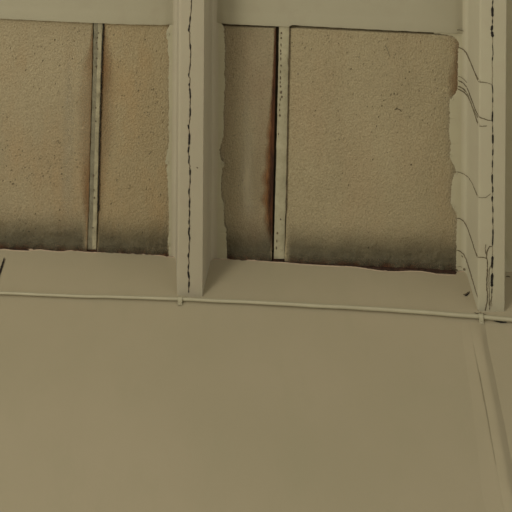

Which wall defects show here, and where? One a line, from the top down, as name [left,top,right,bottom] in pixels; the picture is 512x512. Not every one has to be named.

water stain [0,231,83,251]
peeling [0,25,185,297]
water stain [98,235,167,255]
crack [185,0,193,293]
water stain [227,239,271,261]
rust [263,28,276,237]
peeling [200,23,486,315]
water stain [289,244,458,271]
crack [457,0,494,311]